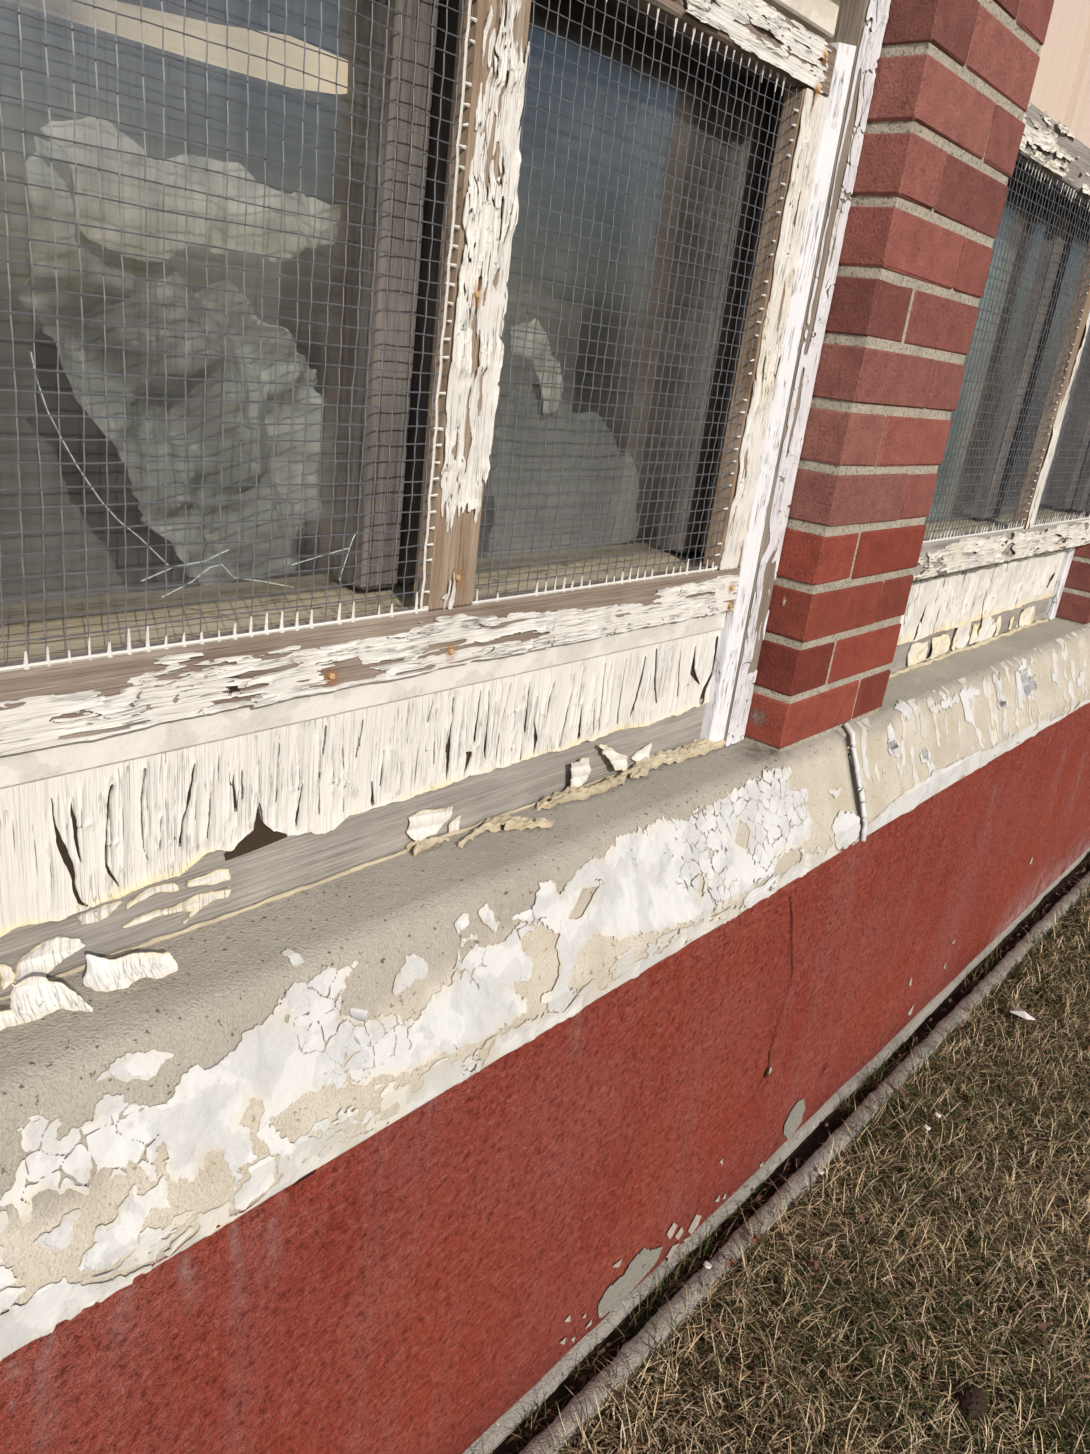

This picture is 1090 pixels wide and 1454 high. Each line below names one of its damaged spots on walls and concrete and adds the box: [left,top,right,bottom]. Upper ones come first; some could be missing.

peeling [441,0,530,534]
peeling [685,0,832,93]
peeling [1019,103,1090,195]
peeling [0,570,741,756]
crack [0,0,891,937]
peeling [907,311,1090,667]
peeling [0,625,1090,1361]